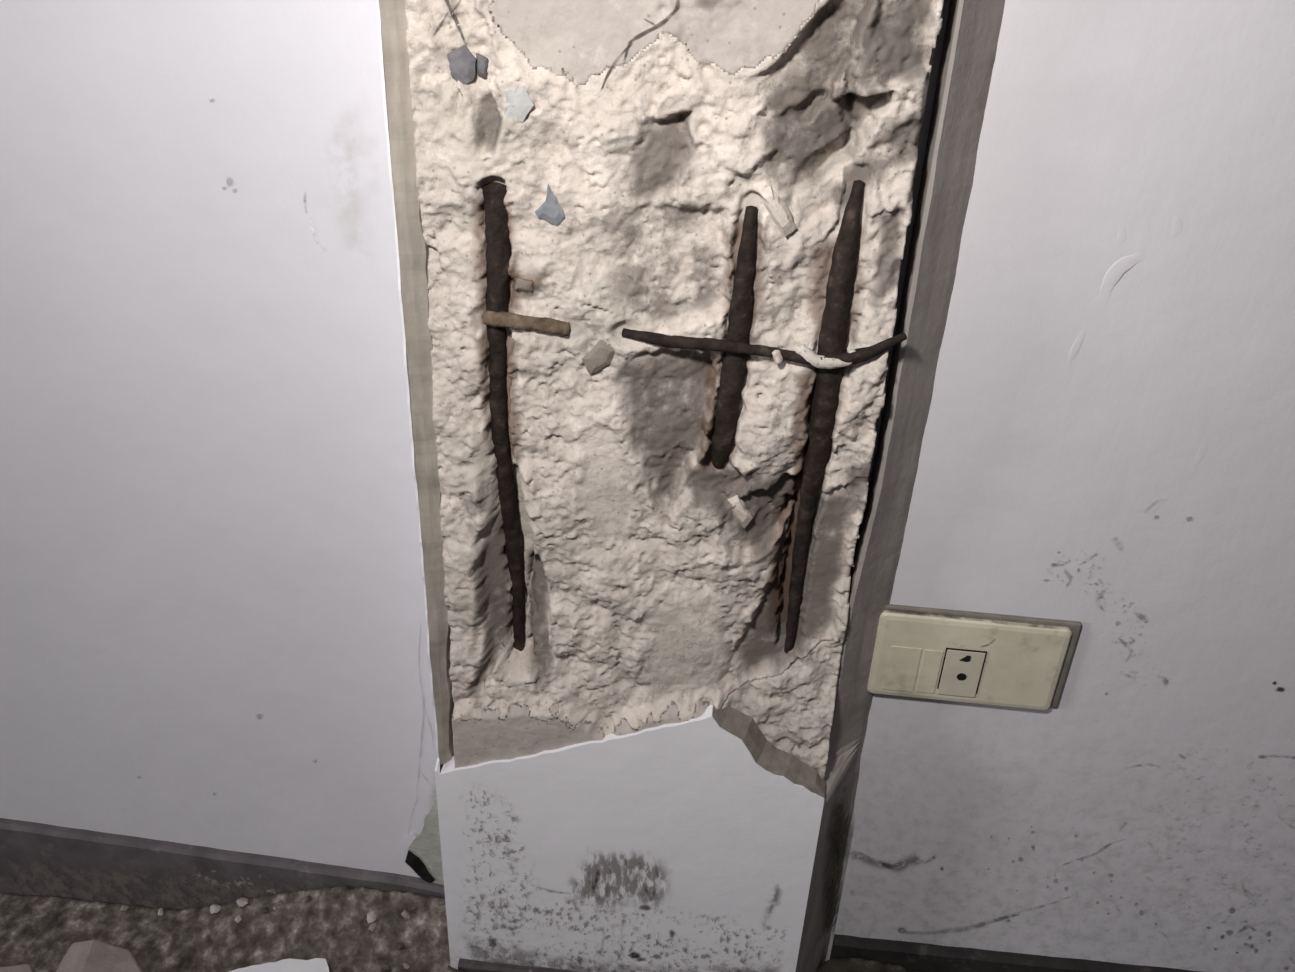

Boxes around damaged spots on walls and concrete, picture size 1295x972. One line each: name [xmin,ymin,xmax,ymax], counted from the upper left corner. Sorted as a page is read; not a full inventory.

spalling [405,0,944,798]
leakage [470,791,529,916]